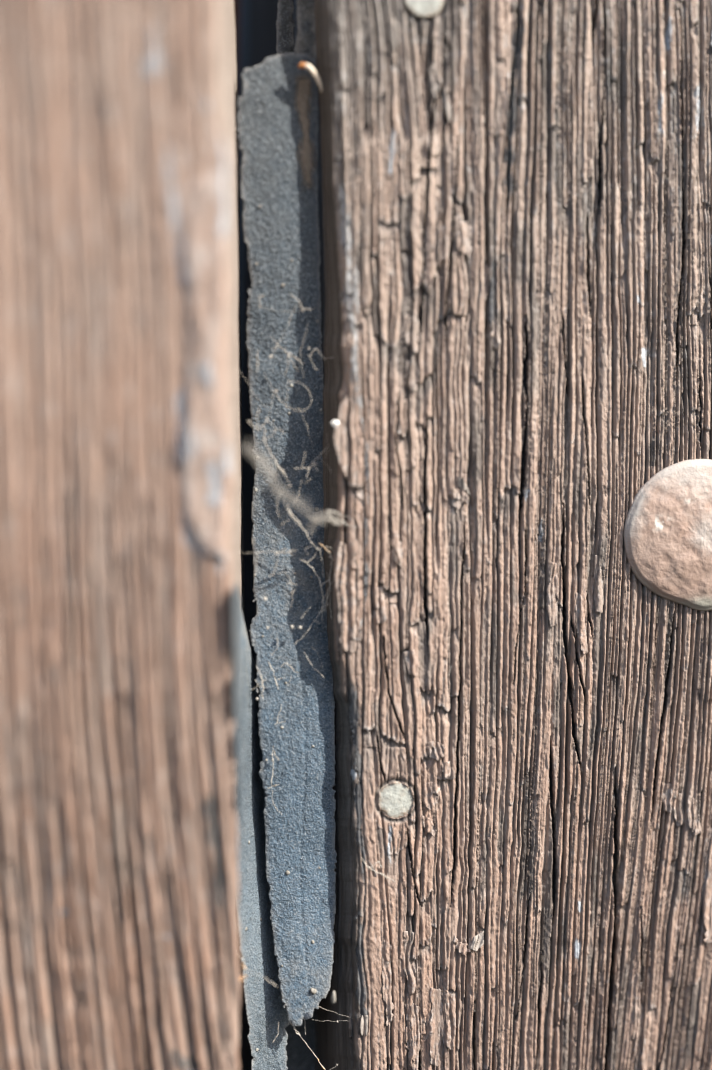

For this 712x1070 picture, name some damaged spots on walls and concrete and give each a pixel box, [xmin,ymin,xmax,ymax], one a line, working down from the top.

crack [585,0,606,313]
peeling [334,538,360,654]
peeling [333,397,364,502]
peeling [373,586,386,624]
peeling [390,531,404,566]
crack [387,399,429,646]
peeling [402,314,420,391]
crack [451,533,465,894]
peeling [451,477,470,510]
crack [513,320,529,682]
crack [515,511,592,1070]
crack [604,783,643,1070]